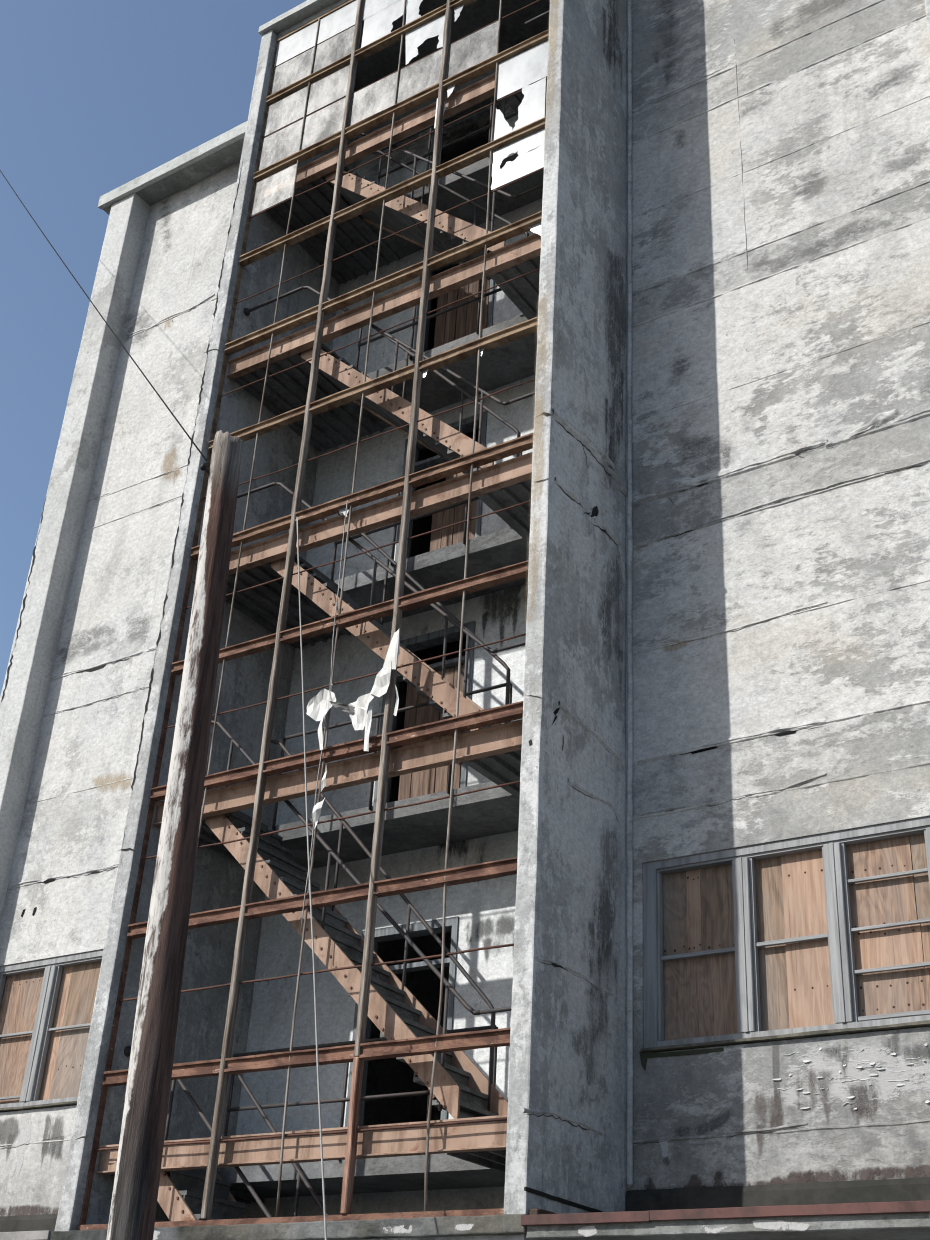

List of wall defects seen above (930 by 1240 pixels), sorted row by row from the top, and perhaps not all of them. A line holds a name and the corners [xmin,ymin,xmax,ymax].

crack [535,408,930,549]
crack [8,162,243,888]
crack [1,499,46,702]
crack [527,695,826,765]
crack [568,772,827,823]
damp [589,832,617,975]
damp [467,917,515,959]
damp [772,1045,780,1104]
damp [798,1073,830,1118]
damp [852,1087,877,1115]
damp [888,1032,930,1068]
damp [0,1114,64,1182]